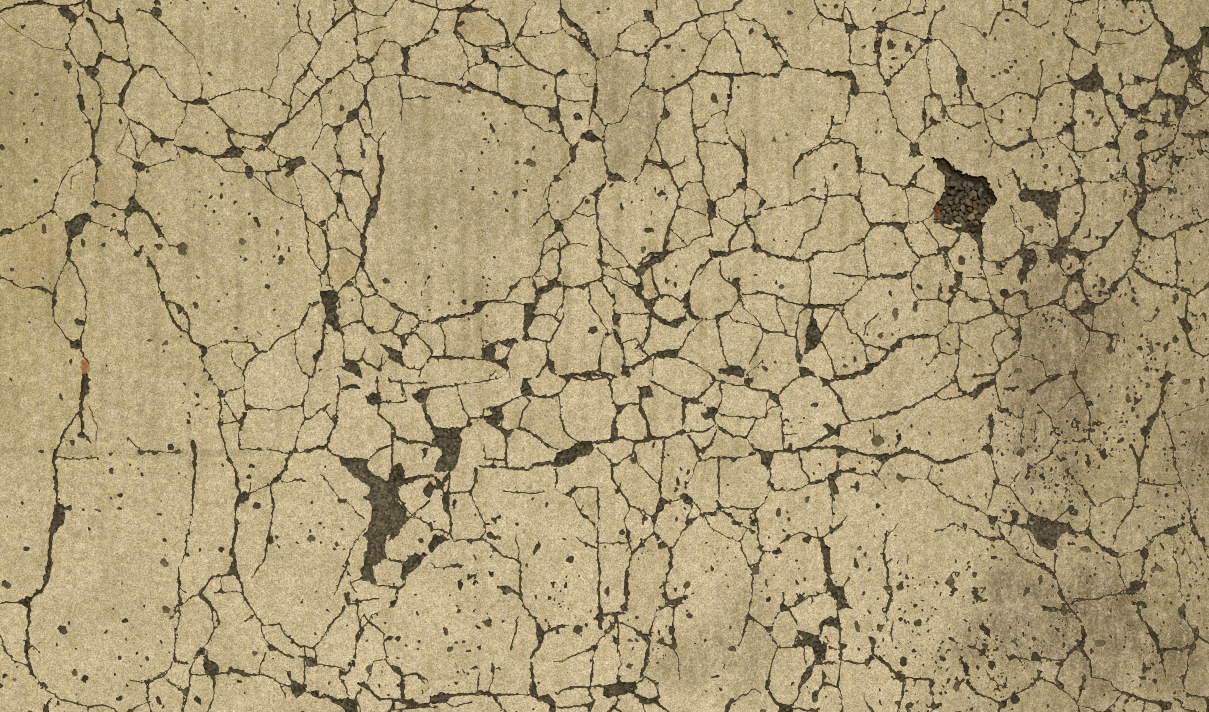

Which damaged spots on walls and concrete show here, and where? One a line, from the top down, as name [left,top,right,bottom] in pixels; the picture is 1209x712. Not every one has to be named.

crack [0,0,204,364]
spalling [832,277,902,372]
spalling [905,91,958,136]
crack [687,0,1209,516]
spalling [1106,91,1209,233]
crack [0,373,117,712]
spalling [431,437,462,473]
spalling [795,559,837,598]
spalling [850,200,1209,712]
crack [925,465,1172,712]
crack [1067,377,1209,712]